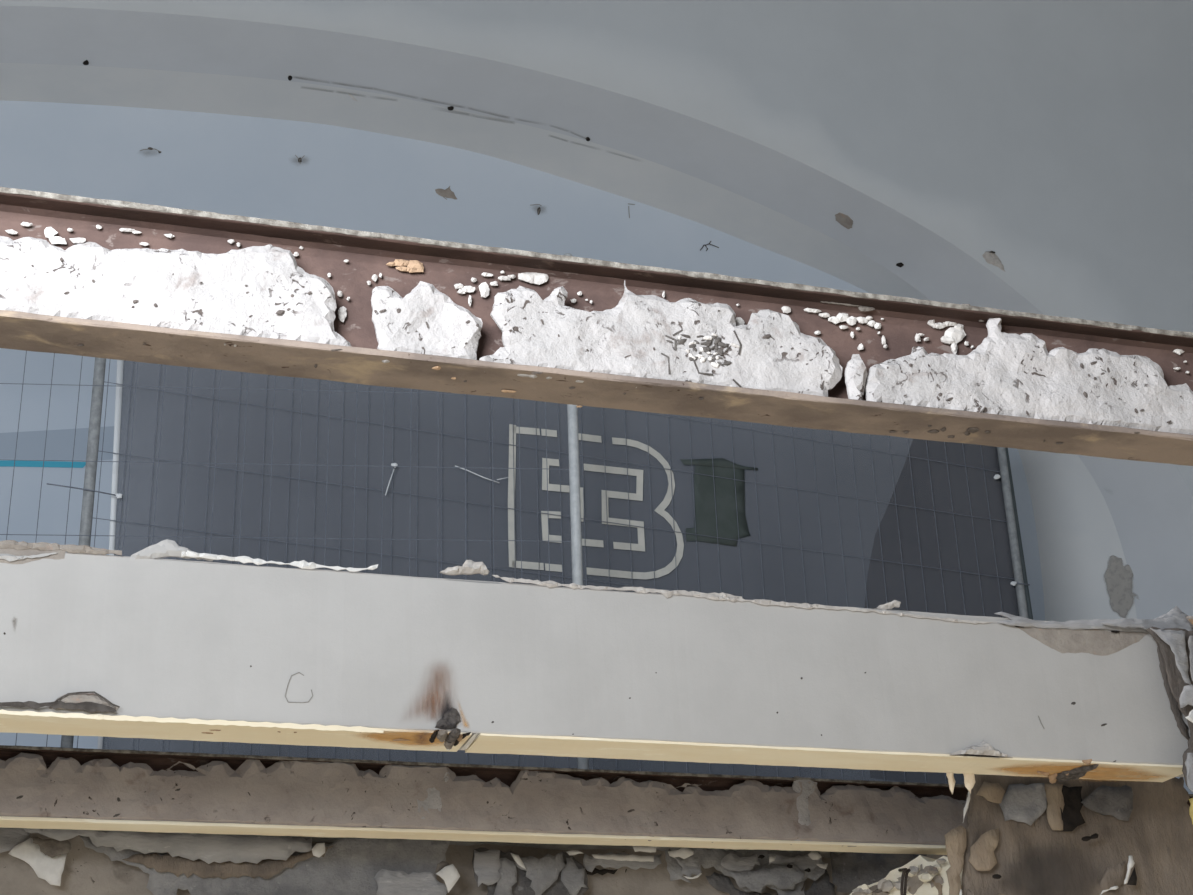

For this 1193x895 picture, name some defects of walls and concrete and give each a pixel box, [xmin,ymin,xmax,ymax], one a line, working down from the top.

peeling [5,222,86,244]
peeling [119,228,149,246]
peeling [367,259,417,285]
peeling [454,270,516,306]
spalling [653,334,736,367]
peeling [781,306,888,351]
peeling [915,320,974,354]
rust [422,675,450,719]
rust [368,731,449,745]
peeling [8,837,71,886]
peeling [311,843,325,857]
peeling [435,861,460,893]